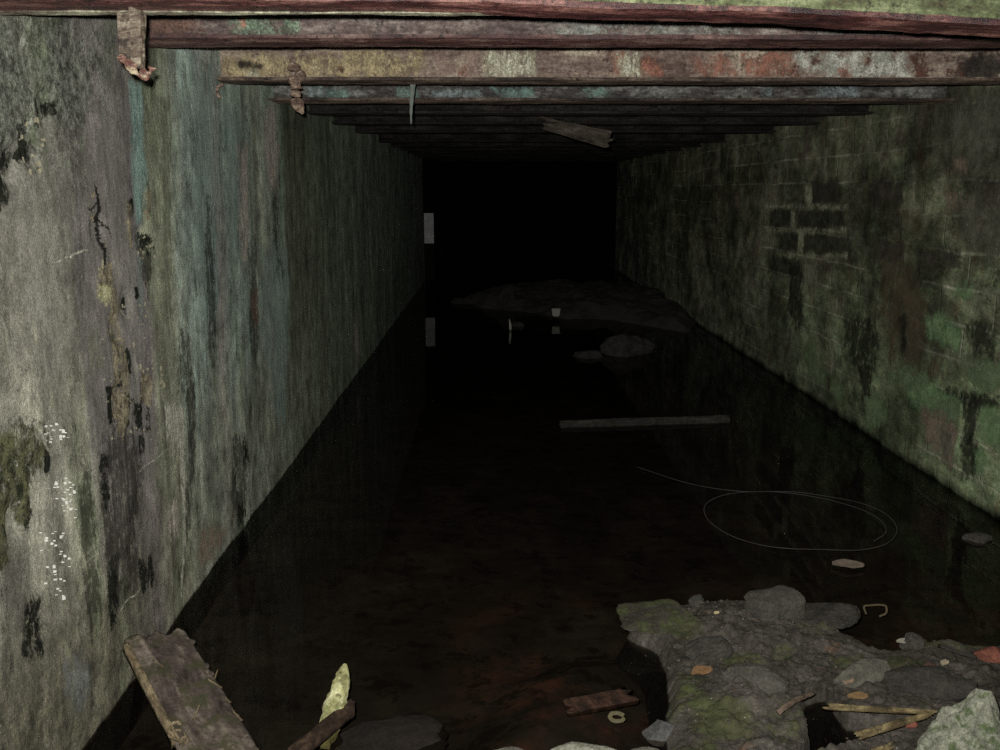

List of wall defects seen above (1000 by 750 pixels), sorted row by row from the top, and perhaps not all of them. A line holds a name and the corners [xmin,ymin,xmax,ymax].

corrosion [689,51,799,77]
crack [87,184,113,269]
water stain [787,265,819,330]
water stain [830,297,879,401]
water stain [965,320,996,360]
water stain [939,385,999,482]
water stain [99,454,110,510]
water stain [39,531,71,600]
water stain [107,552,119,631]
water stain [138,554,154,594]